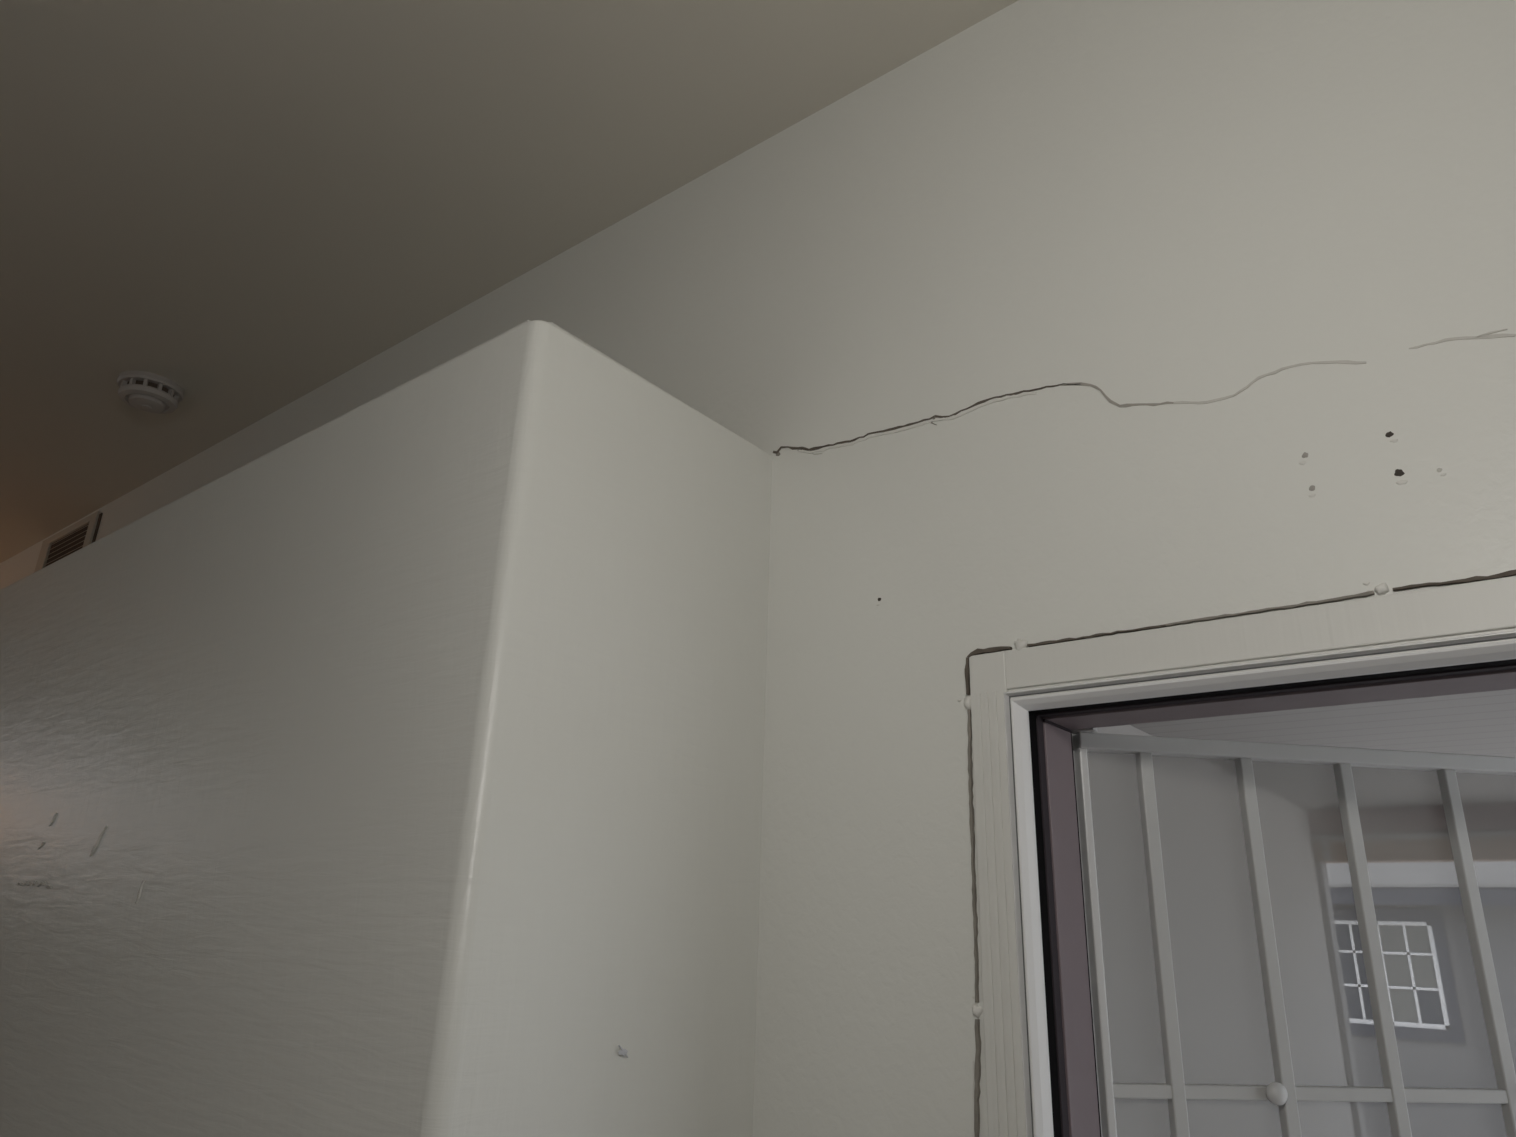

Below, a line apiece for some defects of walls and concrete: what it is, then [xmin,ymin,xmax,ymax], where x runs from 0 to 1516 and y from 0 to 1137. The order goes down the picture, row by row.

crack [1409,329,1516,349]
crack [773,360,1366,456]
crack [965,570,1516,1137]